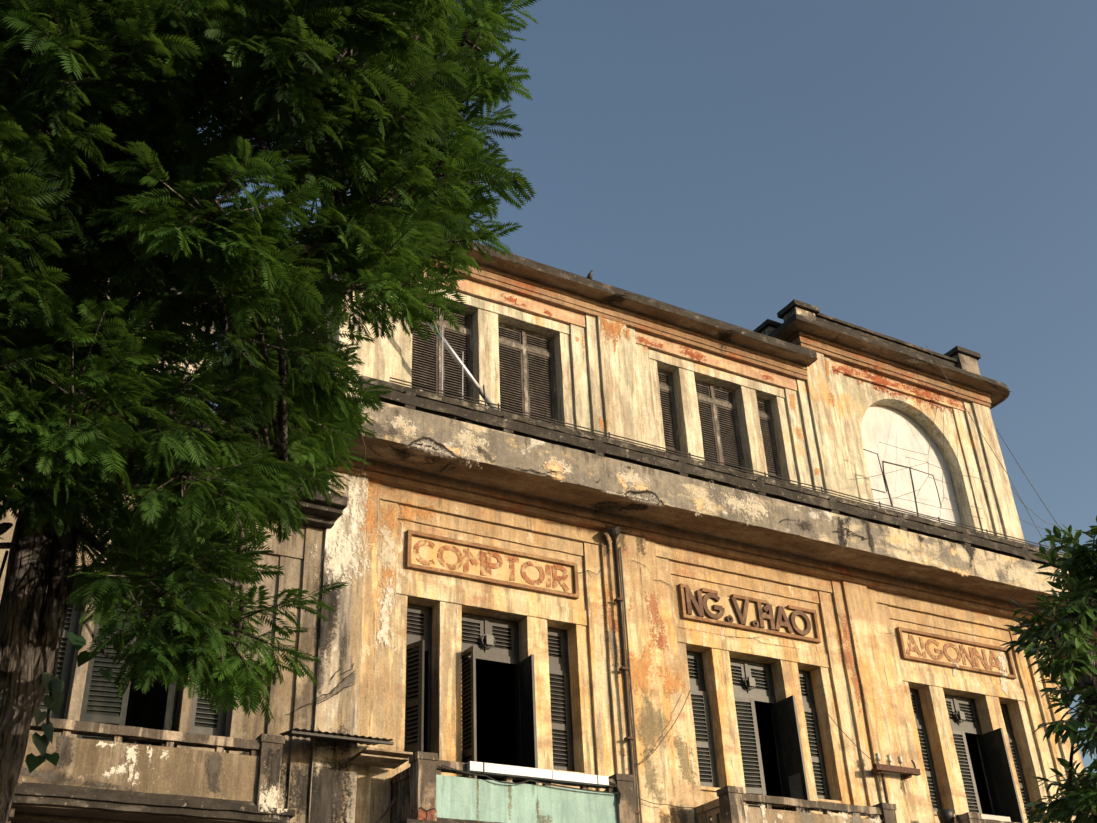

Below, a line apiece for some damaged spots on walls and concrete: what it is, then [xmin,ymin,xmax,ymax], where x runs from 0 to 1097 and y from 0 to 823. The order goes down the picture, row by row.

corrosion [600,316,664,352]
corrosion [821,357,971,418]
peeling [539,455,575,480]
peeling [592,465,664,520]
peeling [311,473,433,655]
peeling [96,741,169,786]
peeling [256,778,288,818]
water stain [263,725,357,823]